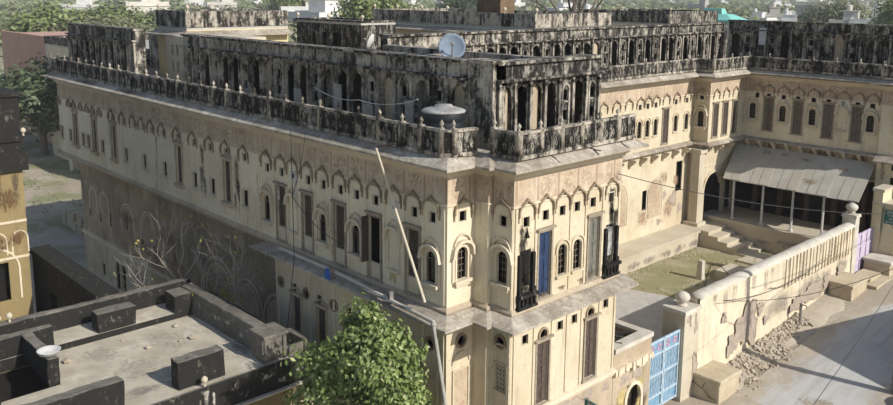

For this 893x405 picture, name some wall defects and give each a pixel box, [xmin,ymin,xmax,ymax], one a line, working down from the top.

flaking render [722,299,769,359]